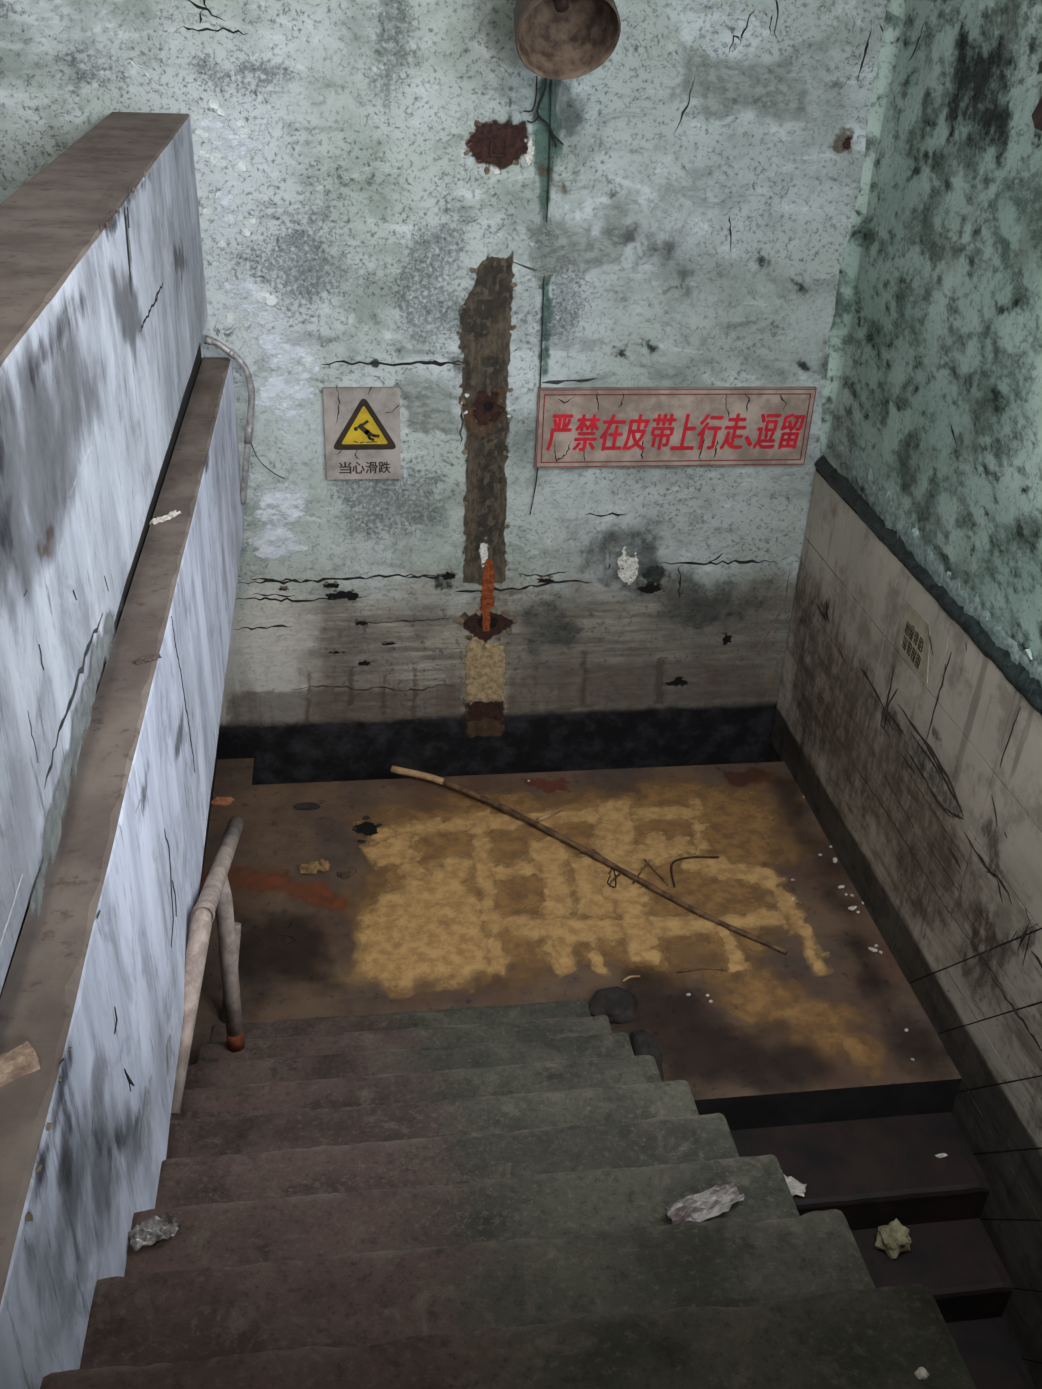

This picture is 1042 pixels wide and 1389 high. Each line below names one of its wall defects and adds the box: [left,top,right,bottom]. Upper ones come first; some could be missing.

crack [181,0,248,35]
crack [729,0,796,52]
mould [945,25,1014,167]
corrosion [463,120,546,175]
crack [321,357,462,370]
corrosion [461,388,511,434]
corrosion [479,543,495,632]
water stain [588,531,740,629]
crack [659,553,791,665]
water stain [817,437,1042,688]
crack [28,576,109,789]
water stain [295,684,455,692]